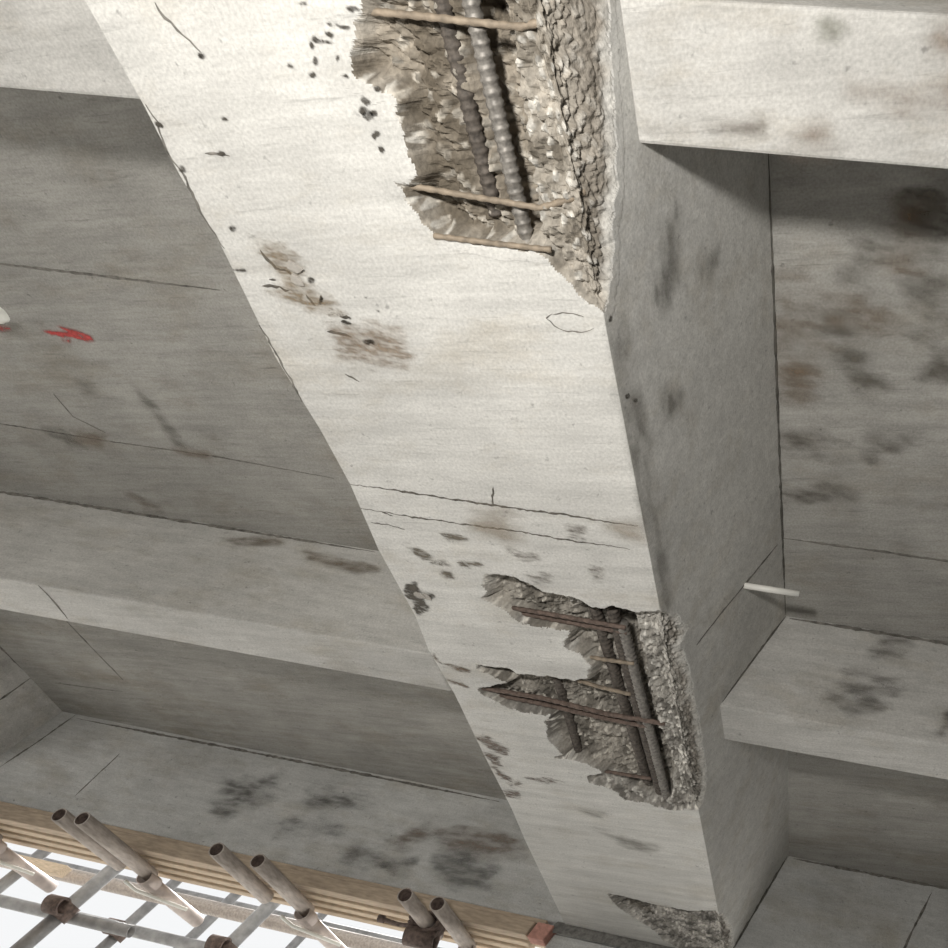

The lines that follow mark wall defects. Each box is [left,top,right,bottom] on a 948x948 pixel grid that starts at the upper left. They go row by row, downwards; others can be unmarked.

crack [155,3,200,52]
spalling [309,0,625,324]
water stain [844,353,881,386]
crack [350,484,634,550]
peeling [413,548,454,579]
spalling [434,562,711,814]
spalling [602,890,736,948]